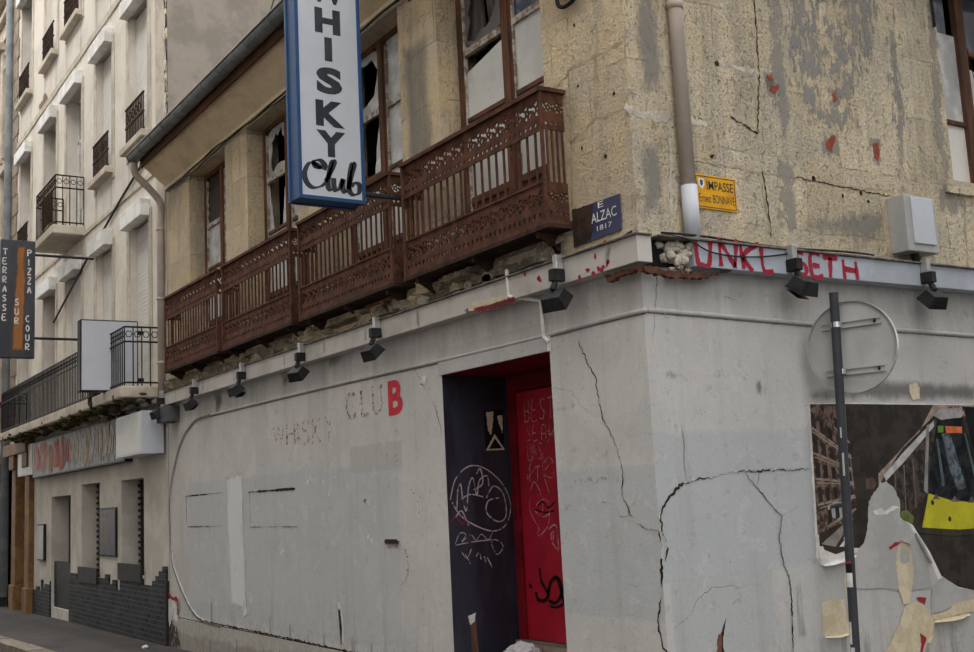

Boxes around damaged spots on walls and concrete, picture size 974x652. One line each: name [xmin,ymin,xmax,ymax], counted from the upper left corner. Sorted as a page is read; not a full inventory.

spalling [764,72,780,96]
peeling [784,0,910,155]
spalling [869,138,881,165]
spalling [604,240,732,283]
spalling [164,233,565,391]
spalling [85,398,158,424]
crack [555,340,812,652]
spalling [717,620,726,652]